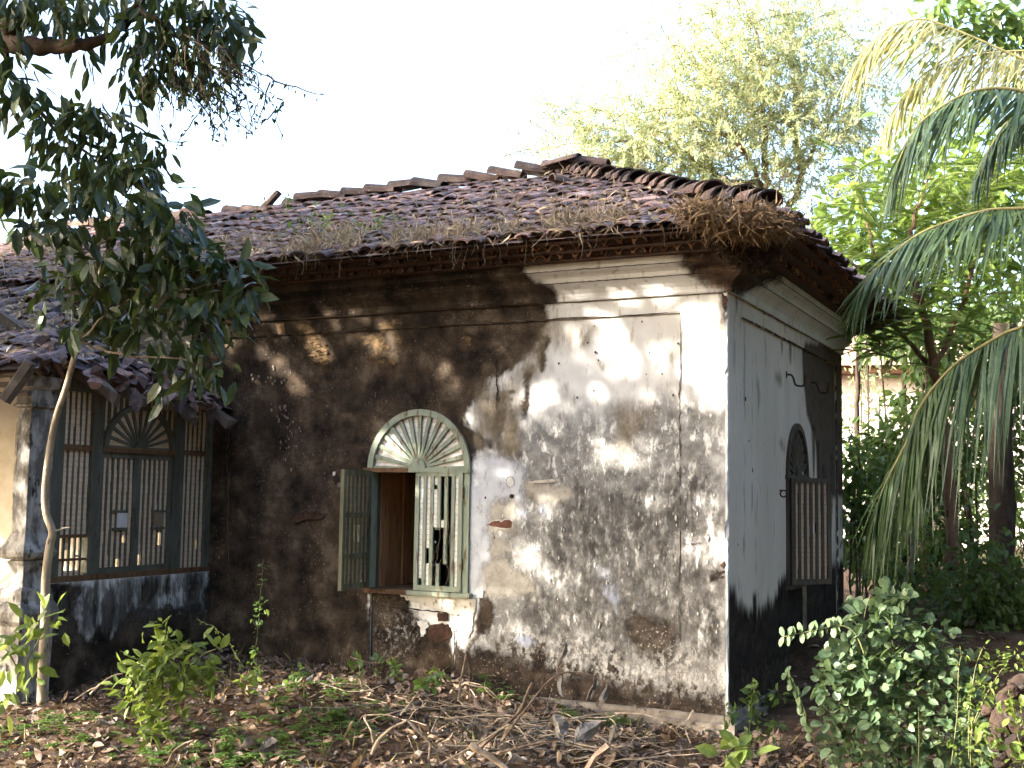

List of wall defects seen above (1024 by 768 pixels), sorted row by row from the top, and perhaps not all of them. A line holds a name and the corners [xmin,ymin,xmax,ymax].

leakage [790,342,843,516]
leakage [48,266,789,716]
flaking render [417,613,457,643]
peeling [484,482,595,599]
leakage [807,560,844,628]